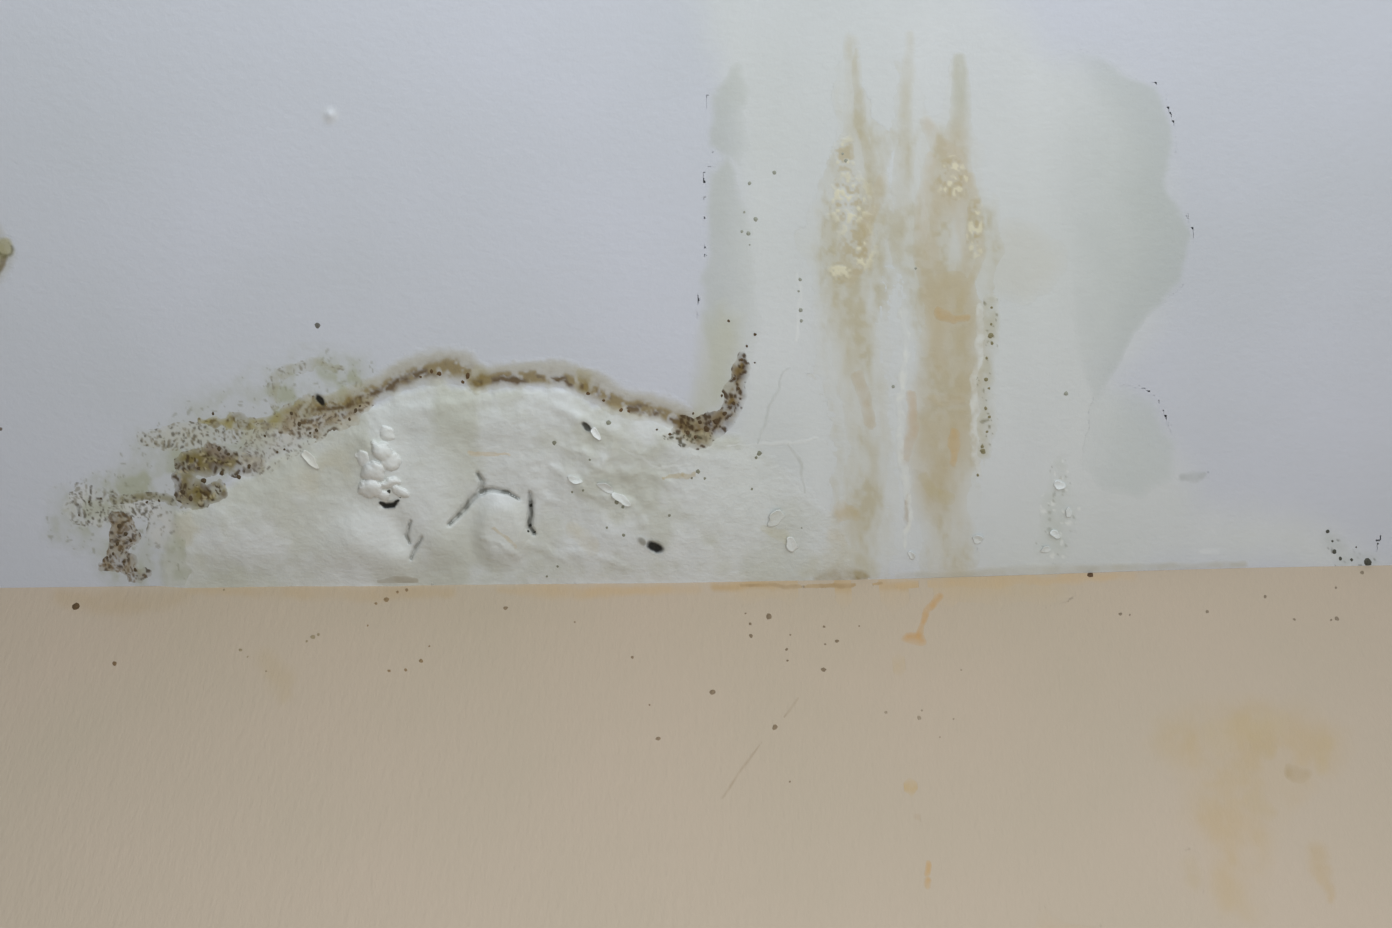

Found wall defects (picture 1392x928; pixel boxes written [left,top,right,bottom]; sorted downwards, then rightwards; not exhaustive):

damp [0,220,20,288]
damp [36,0,1392,587]
corrosion [494,29,1139,679]